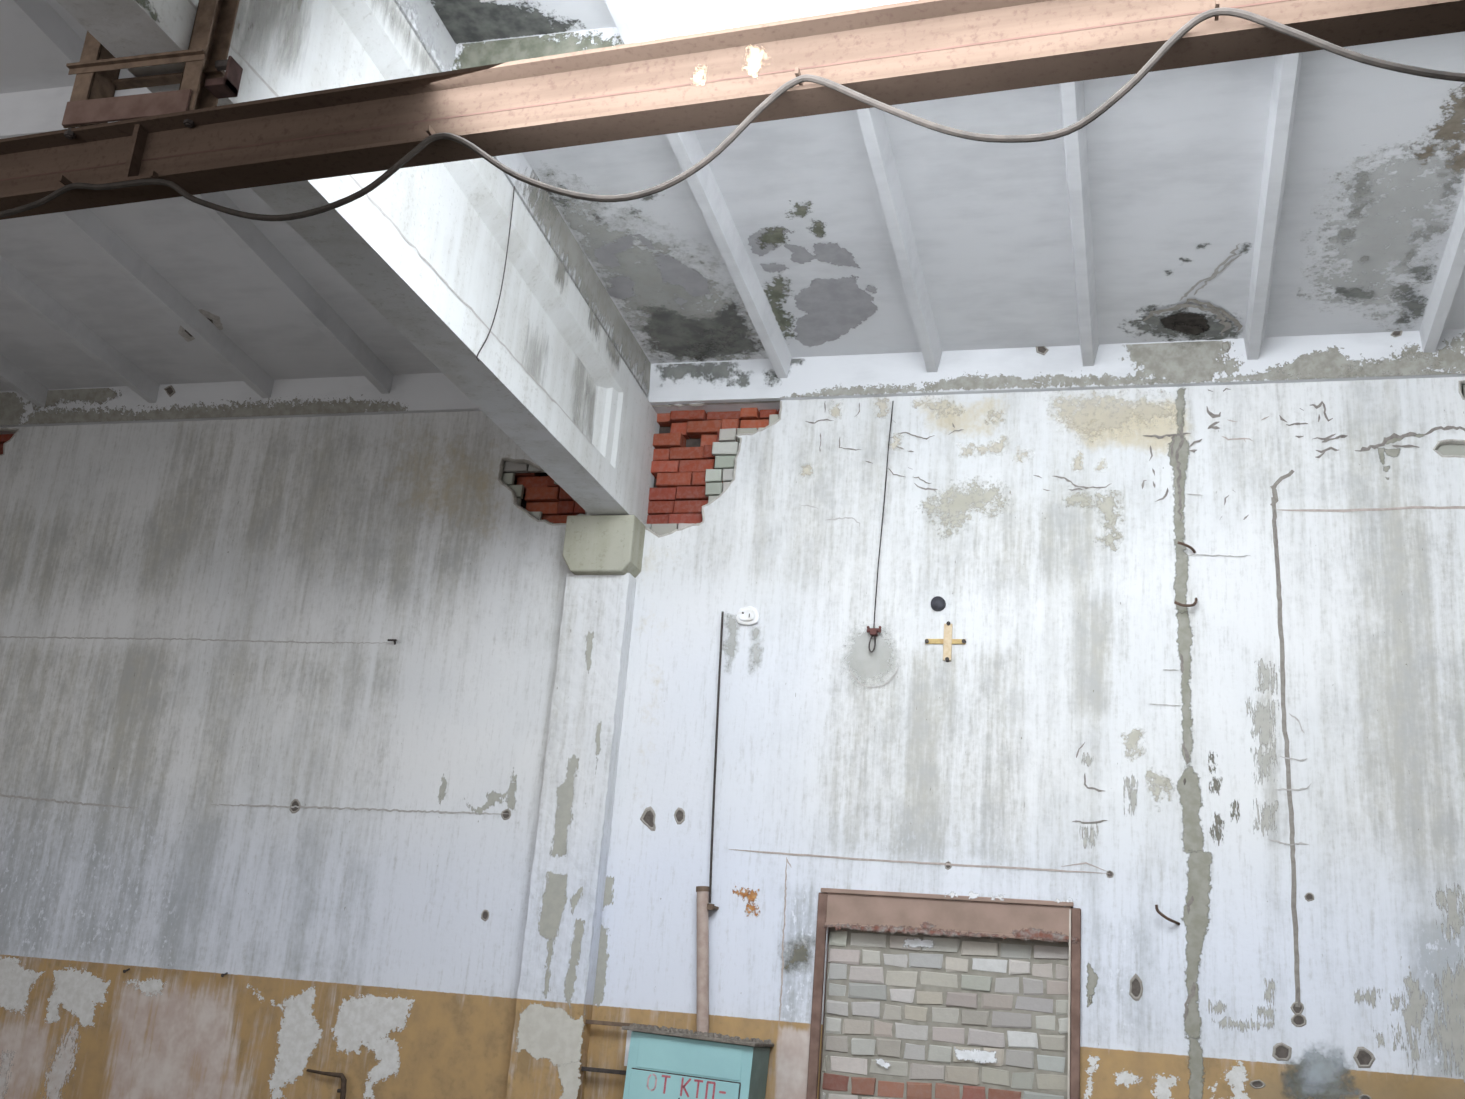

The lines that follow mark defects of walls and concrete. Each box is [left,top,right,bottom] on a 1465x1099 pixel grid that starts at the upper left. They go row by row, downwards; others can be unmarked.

damp [399,0,624,71]
damp [1410,84,1465,173]
damp [757,201,825,250]
damp [524,178,804,396]
peeling [748,226,877,347]
damp [1393,266,1436,324]
peeling [0,388,408,456]
flaking render [640,299,1465,538]
crack [1034,388,1465,1099]
peeling [515,723,614,1099]
peeling [0,954,167,1099]
peeling [246,983,415,1099]